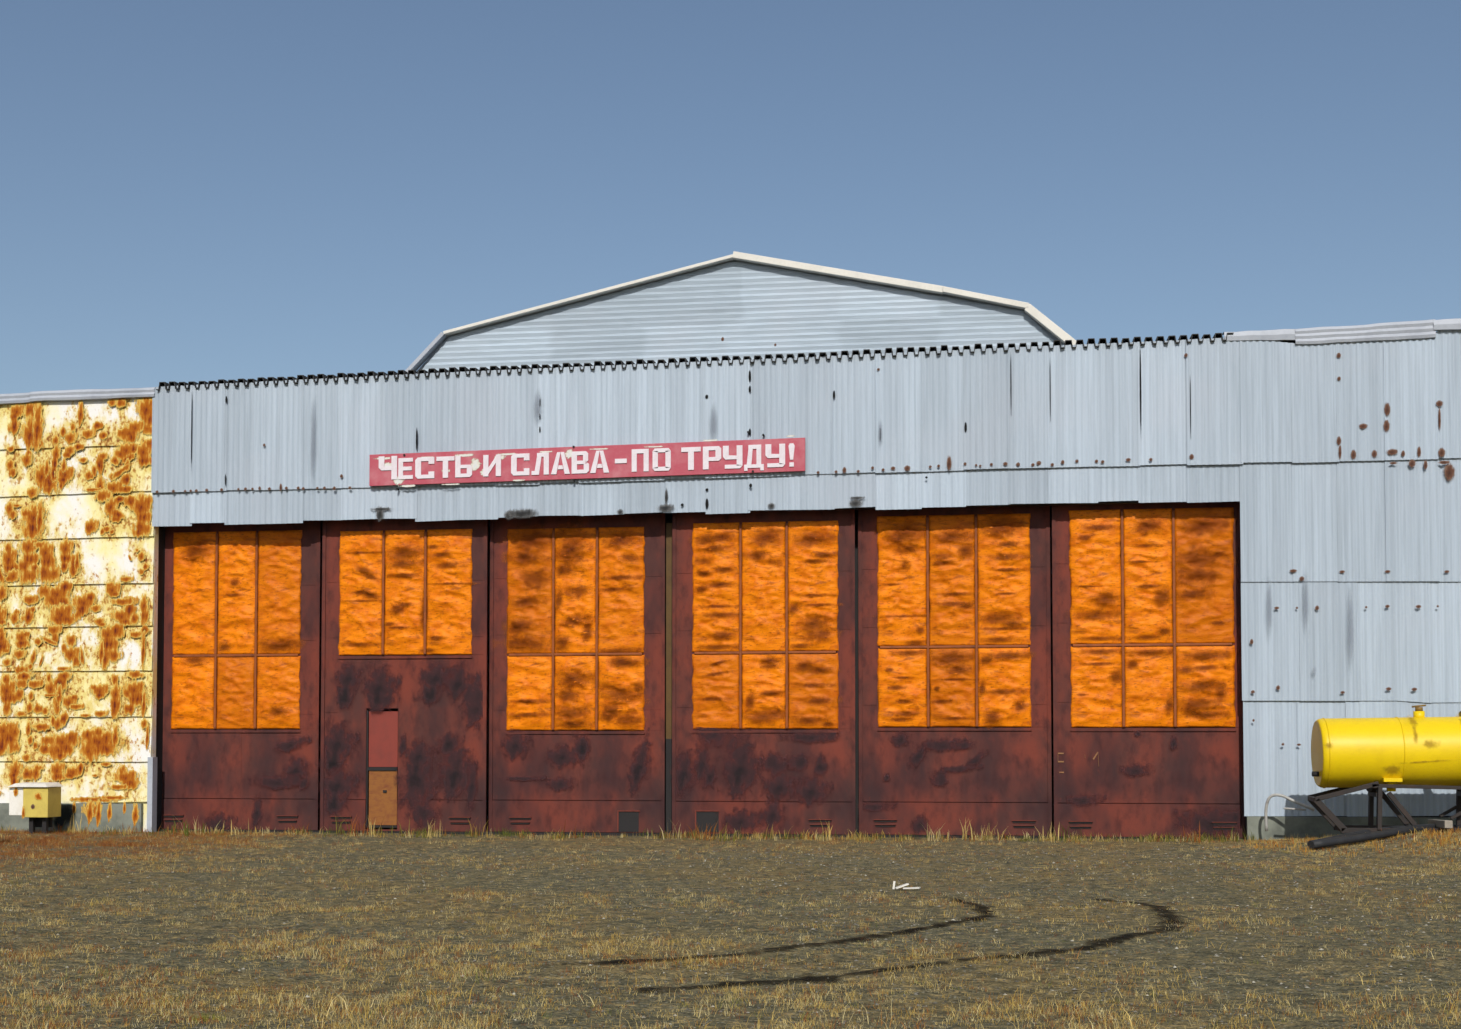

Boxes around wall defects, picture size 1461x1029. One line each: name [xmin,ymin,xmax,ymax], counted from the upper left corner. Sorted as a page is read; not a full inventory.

corrosion [0,397,351,827]
corrosion [1337,403,1455,481]